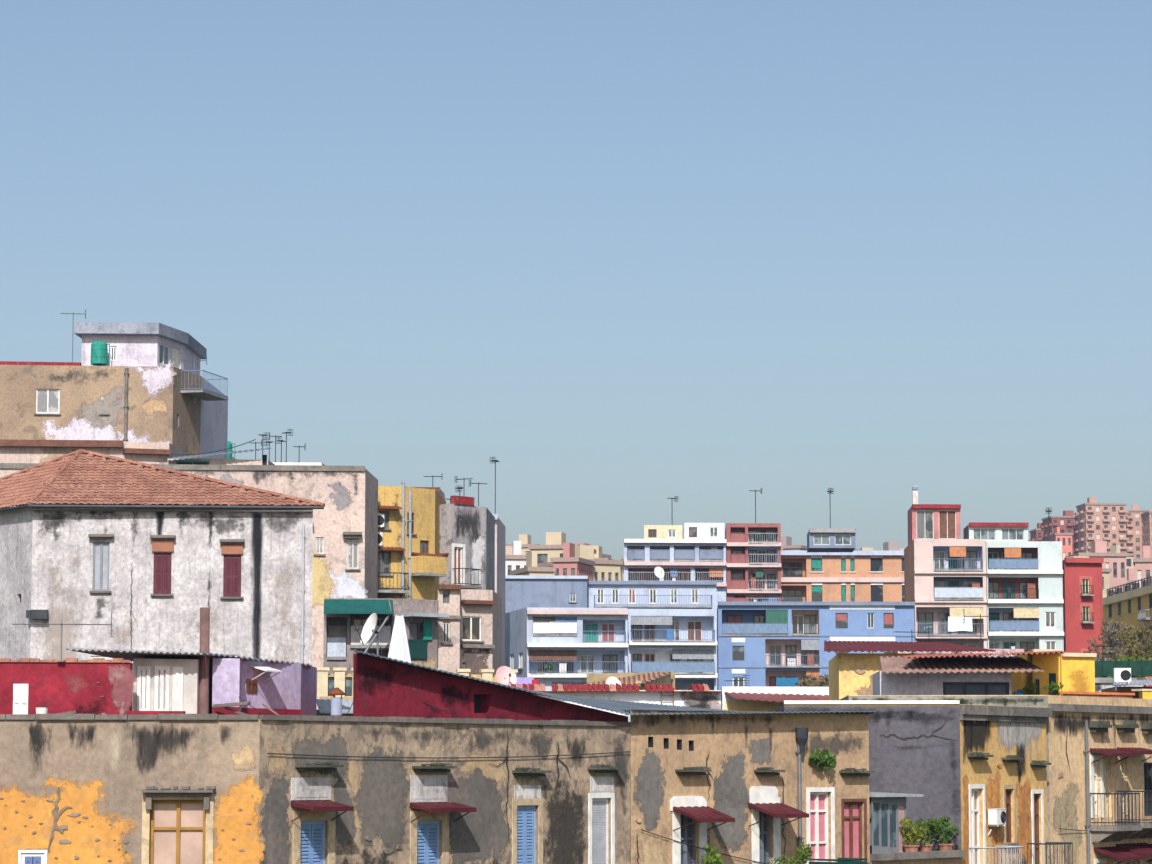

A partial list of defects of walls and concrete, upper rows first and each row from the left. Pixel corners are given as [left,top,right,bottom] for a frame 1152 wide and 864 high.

spalling [142,399,168,415]
peeling [328,482,353,511]
water stain [42,511,120,532]
water stain [456,512,480,540]
water stain [156,512,298,659]
spalling [462,648,489,675]
water stain [690,697,721,721]
water stain [30,728,44,761]
water stain [135,728,190,770]
peeling [0,777,138,864]
peeling [213,744,288,864]
spalling [1053,772,1083,864]